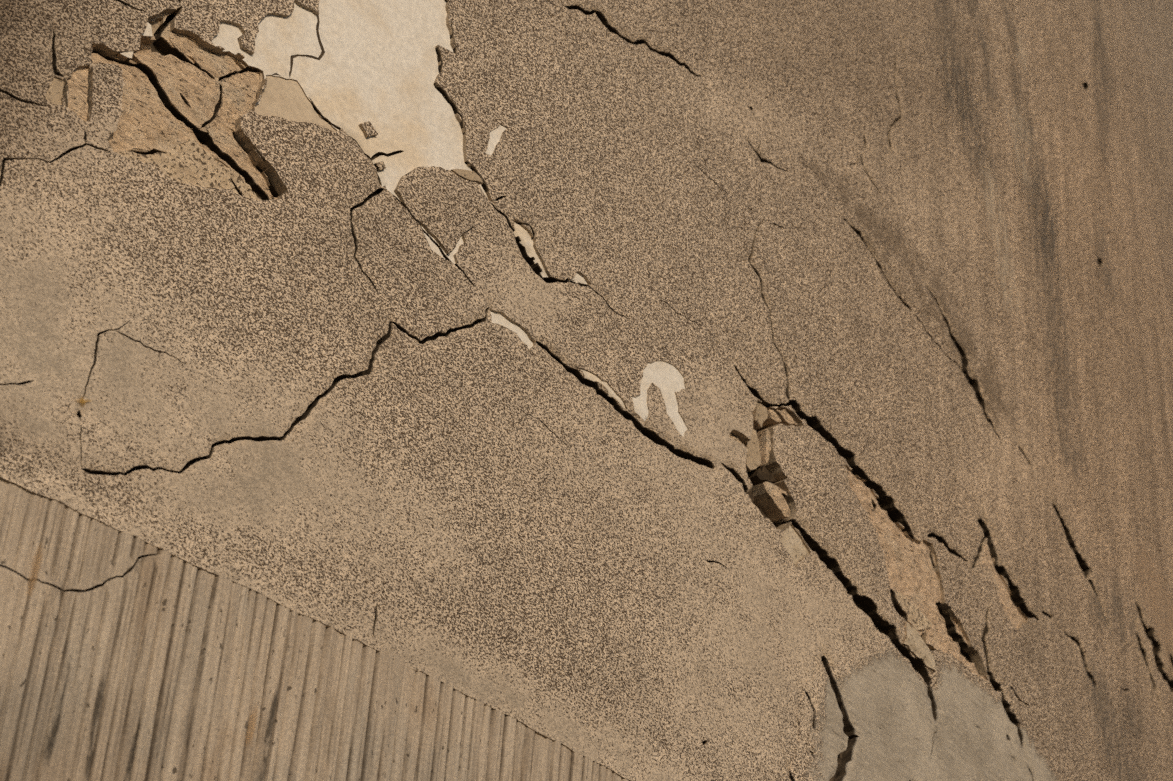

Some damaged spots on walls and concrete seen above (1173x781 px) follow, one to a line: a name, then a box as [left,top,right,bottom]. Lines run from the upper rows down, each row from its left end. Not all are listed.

peeling [46,0,488,203]
crack [565,6,696,76]
crack [0,554,156,592]
crack [77,34,610,476]
peeling [580,361,687,437]
crack [536,342,747,493]
crack [748,223,780,306]
spalling [729,402,809,565]
spalling [846,468,985,679]
crack [844,220,997,435]
crack [735,334,1173,781]
spalling [982,544,1026,629]